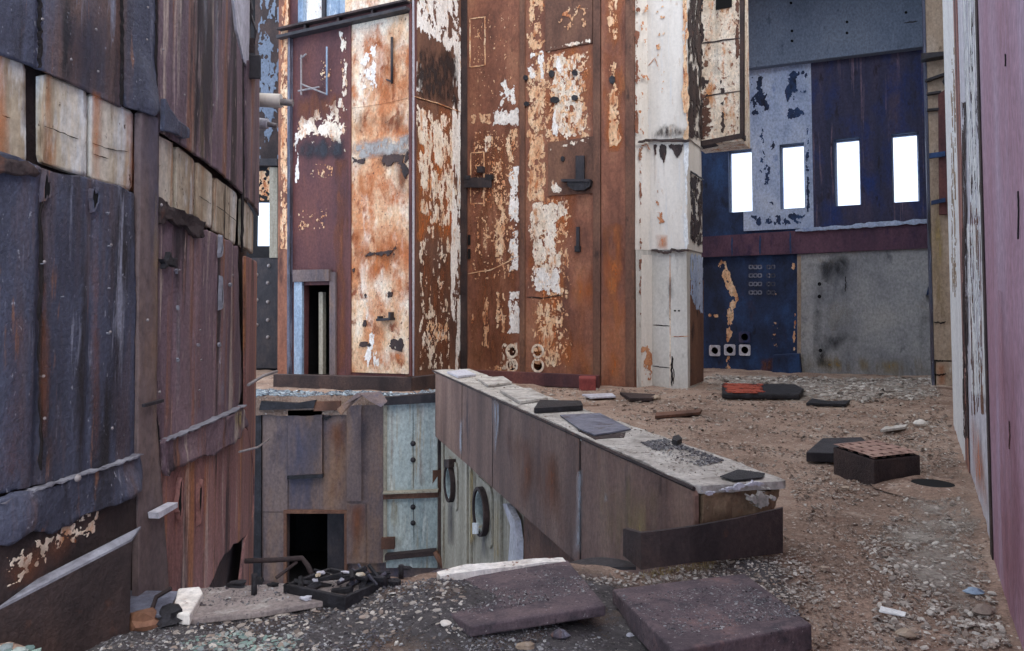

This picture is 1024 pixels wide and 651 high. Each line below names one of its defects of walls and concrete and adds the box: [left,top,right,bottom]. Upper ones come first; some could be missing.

peeling [258,0,591,371]
corrosion [475,136,517,364]
corrosion [544,195,570,242]
peeling [690,254,739,342]
spalling [701,480,777,509]
peeling [7,511,99,586]